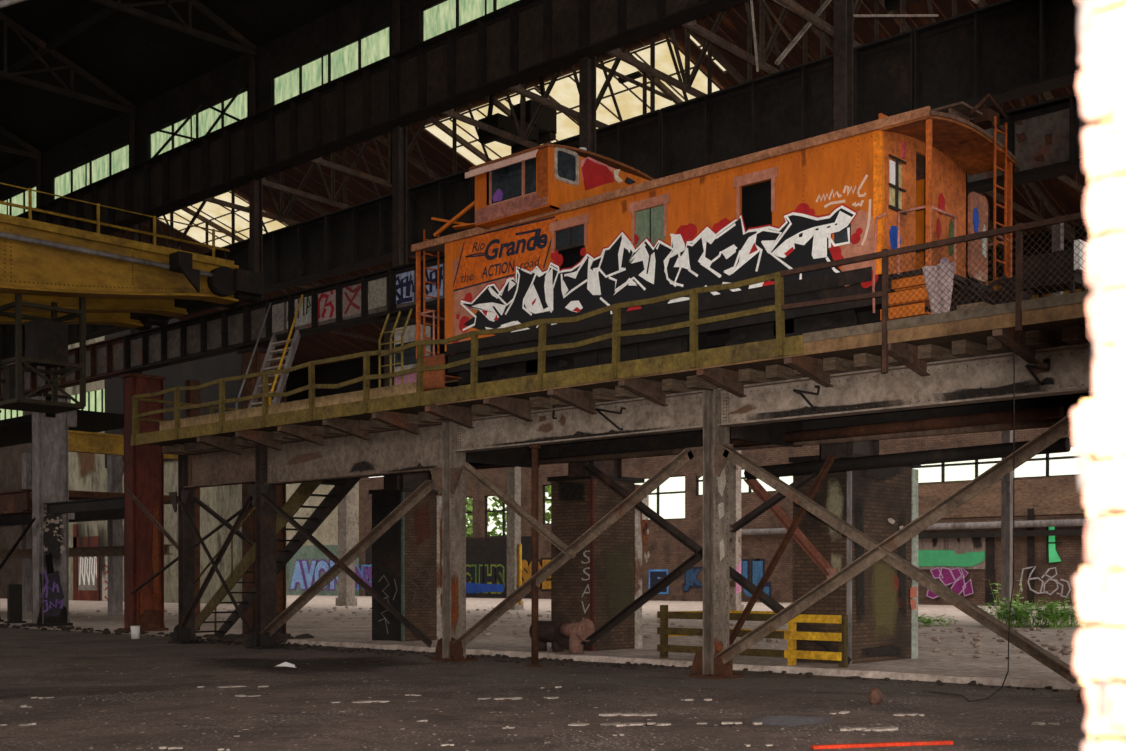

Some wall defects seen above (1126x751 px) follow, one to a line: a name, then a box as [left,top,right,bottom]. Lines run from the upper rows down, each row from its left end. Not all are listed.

leakage [943,377,1054,401]
leakage [755,401,901,420]